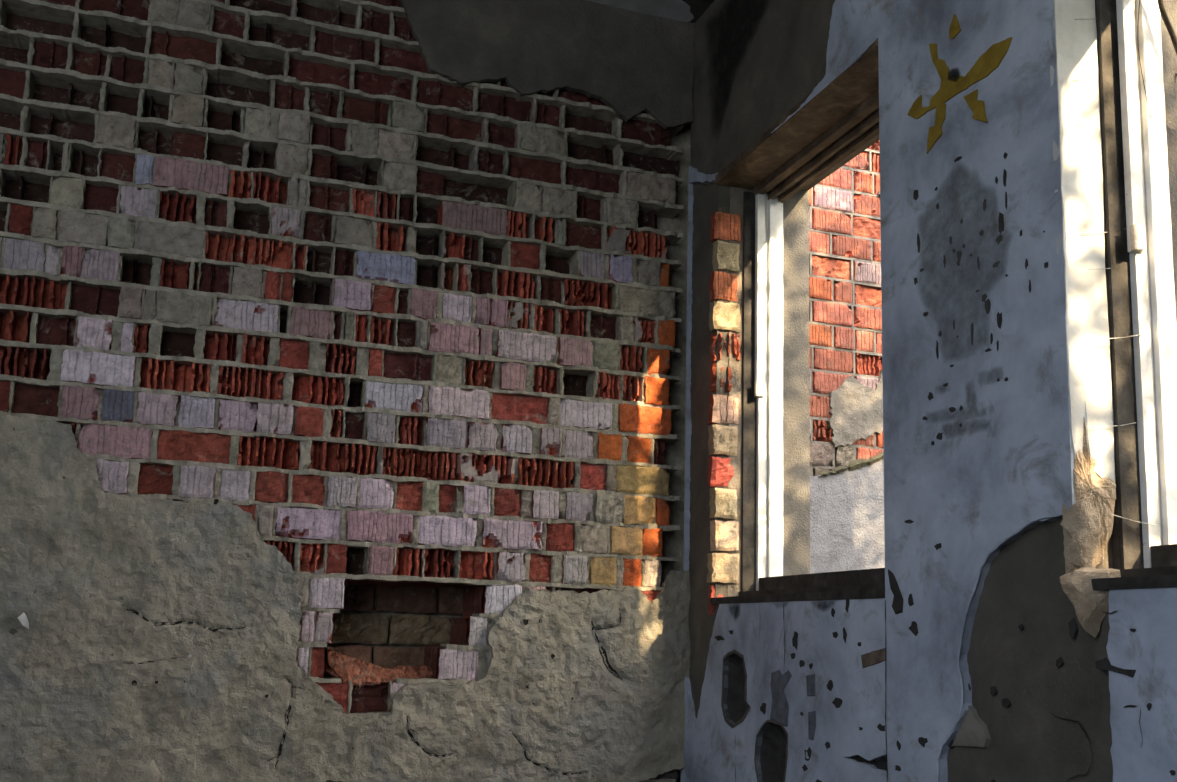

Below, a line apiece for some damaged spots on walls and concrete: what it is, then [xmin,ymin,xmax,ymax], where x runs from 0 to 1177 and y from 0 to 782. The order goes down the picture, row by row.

flaking render [809,140,883,477]
flaking render [0,0,835,782]
flaking render [888,569,918,636]
flaking render [918,420,1136,782]
flaking render [832,627,885,668]
peeling [827,680,843,708]
spalling [847,740,901,771]